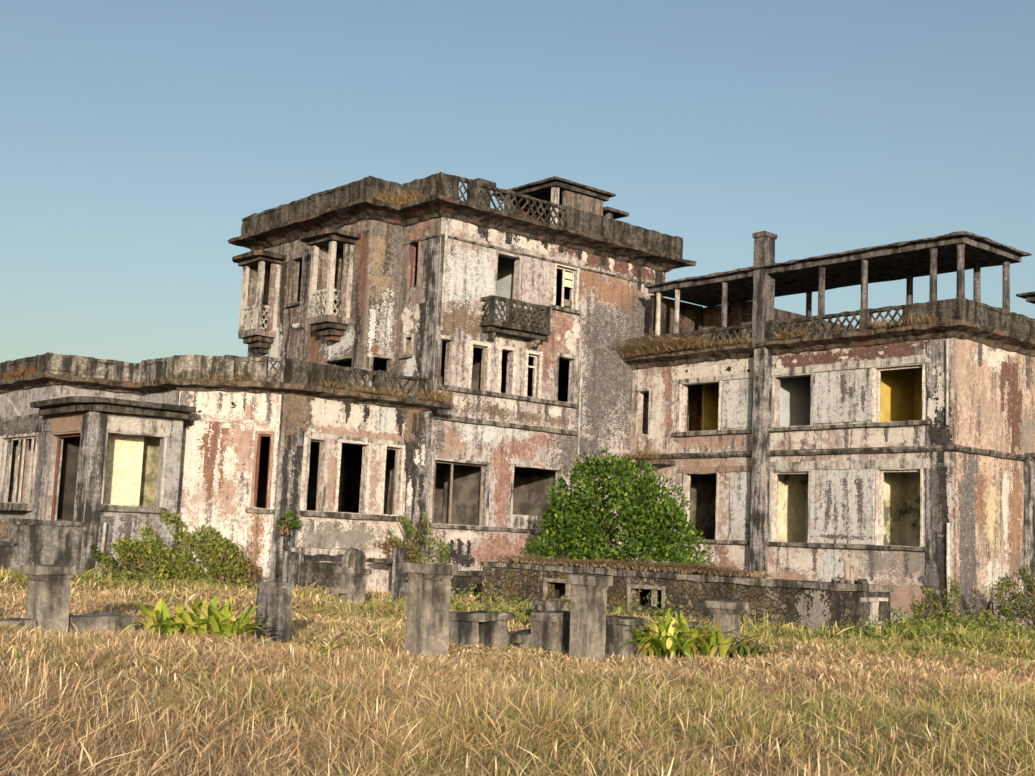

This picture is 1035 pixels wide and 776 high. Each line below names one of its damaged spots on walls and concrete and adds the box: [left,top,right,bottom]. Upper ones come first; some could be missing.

damp [477,226,583,260]
peeling [344,235,395,358]
peeling [403,355,417,381]
peeling [401,301,420,335]
damp [395,253,666,539]
damp [1018,355,1034,455]
peeling [182,392,273,525]
damp [266,393,393,559]
peeling [768,528,807,580]
peeling [867,578,926,623]
damp [811,407,1024,628]